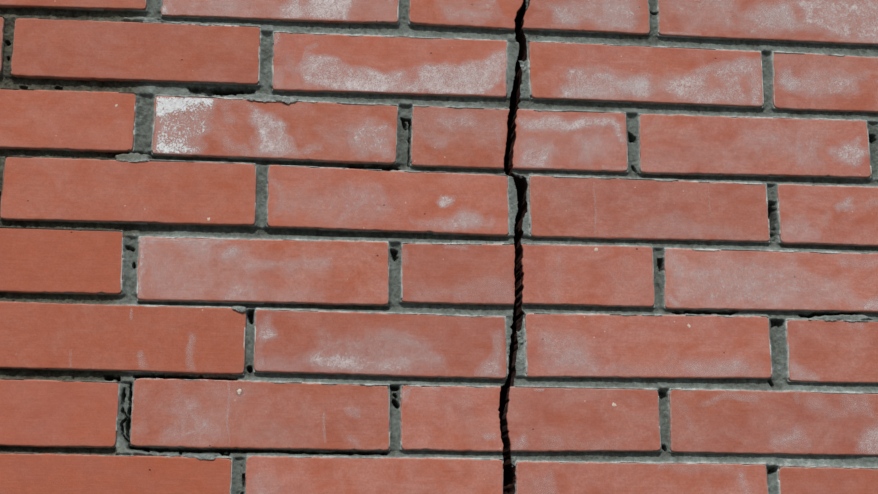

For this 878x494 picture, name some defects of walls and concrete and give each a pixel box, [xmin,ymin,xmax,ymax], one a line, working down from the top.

leakage [303,52,505,94]
leakage [154,97,214,154]
leakage [252,109,291,154]
crack [498,0,530,494]